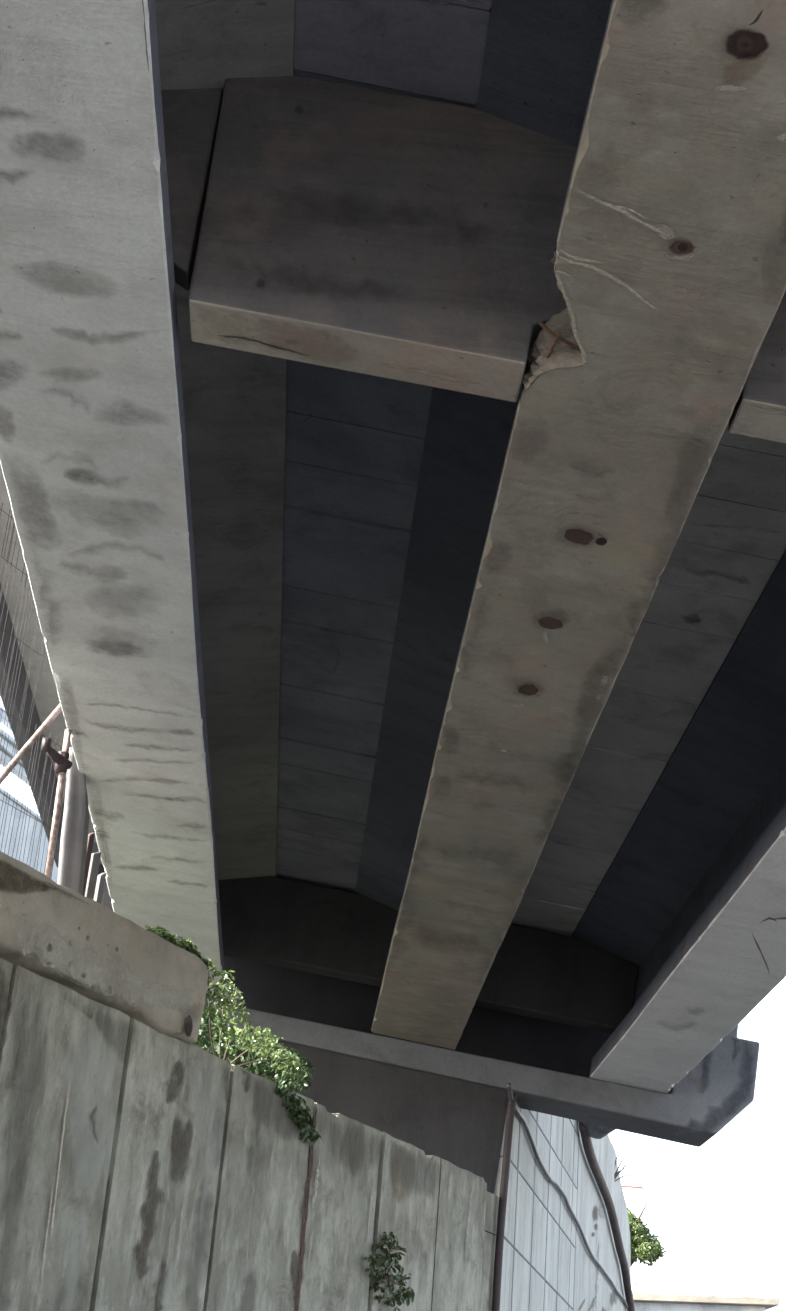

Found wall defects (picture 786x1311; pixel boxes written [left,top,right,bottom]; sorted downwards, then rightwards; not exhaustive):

corrosion [726,10,769,59]
crack [577,190,665,233]
corrosion [657,226,696,259]
crack [554,249,655,309]
spalling [522,249,588,389]
corrosion [565,529,607,545]
corrosion [539,617,563,640]
crack [752,917,786,974]
water stain [0,973,40,1179]
water stain [167,1060,189,1102]
water stain [685,1038,752,1133]
water stain [137,1118,193,1311]